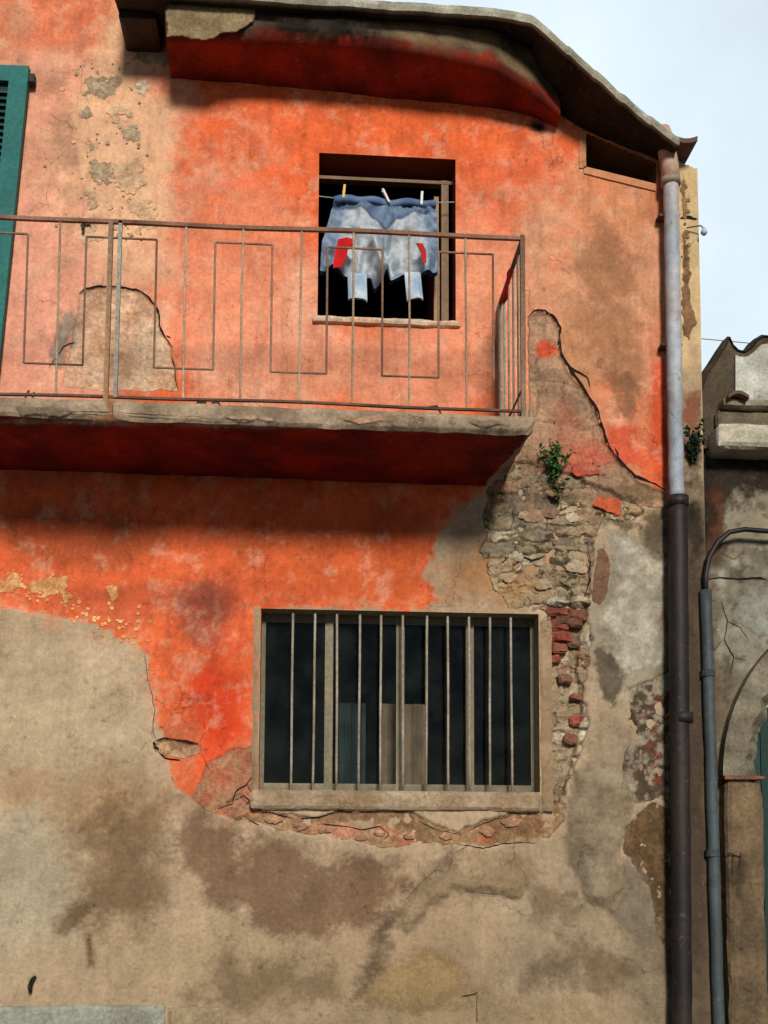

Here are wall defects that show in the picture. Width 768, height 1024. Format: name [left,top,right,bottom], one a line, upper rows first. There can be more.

peeling [55,4,255,248]
peeling [51,287,178,392]
spalling [16,406,73,417]
crack [528,309,666,490]
peeling [0,569,152,644]
flaking render [192,311,671,947]
damp [595,648,624,706]
crack [714,604,747,677]
crack [711,552,767,580]
damp [85,801,163,918]
damp [181,809,479,1011]